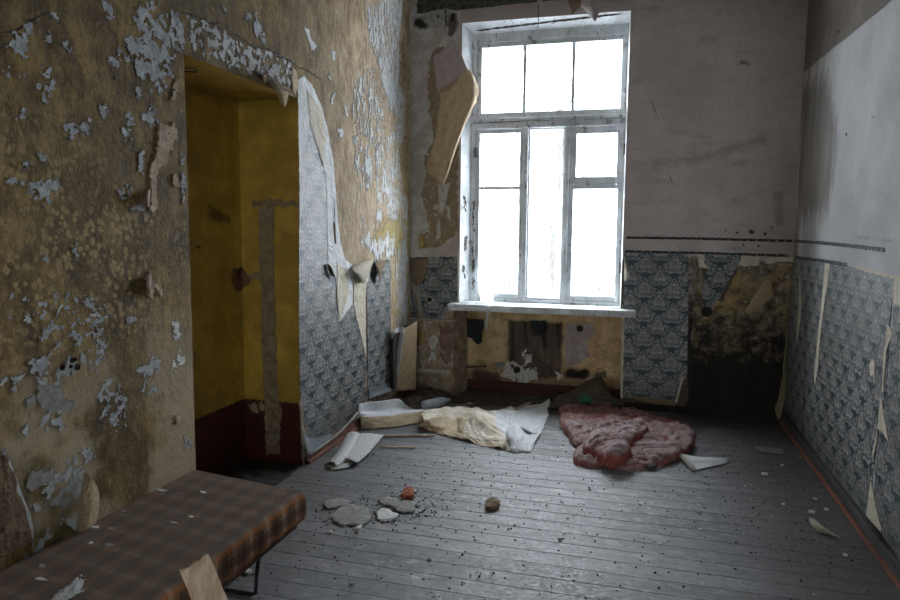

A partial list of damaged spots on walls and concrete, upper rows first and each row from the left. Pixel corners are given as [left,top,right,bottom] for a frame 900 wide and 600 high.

peeling [5,152,60,207]
peeling [102,0,298,215]
peeling [337,0,409,327]
peeling [421,39,479,289]
flaking render [0,290,128,437]
peeling [136,321,185,395]
spalling [494,349,538,383]
flaking render [555,322,595,380]
damp [683,256,792,413]
peeling [20,447,96,559]